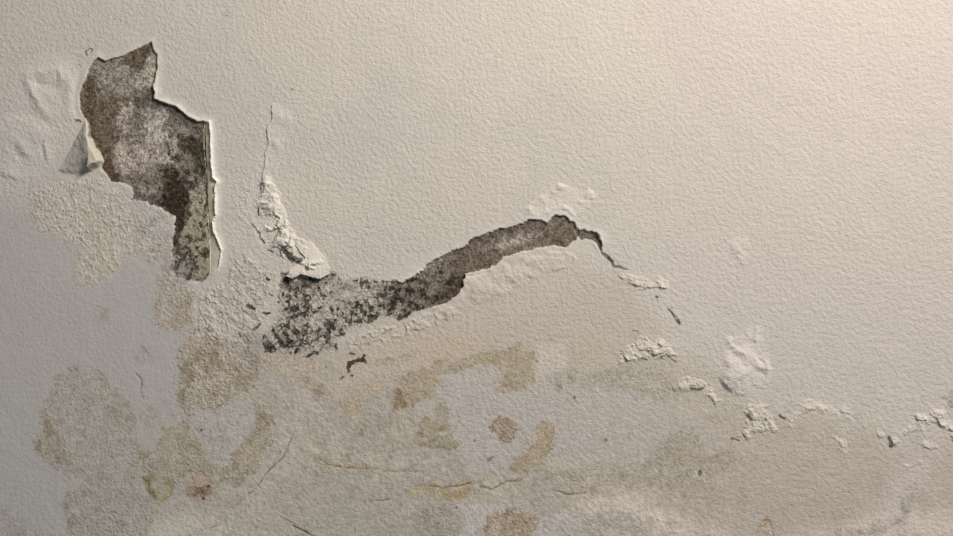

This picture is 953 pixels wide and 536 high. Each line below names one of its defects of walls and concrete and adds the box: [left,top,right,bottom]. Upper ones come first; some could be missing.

peeling [53,35,230,285]
peeling [251,173,612,358]
water stain [0,190,681,536]
crack [189,437,292,536]
water stain [509,418,744,536]